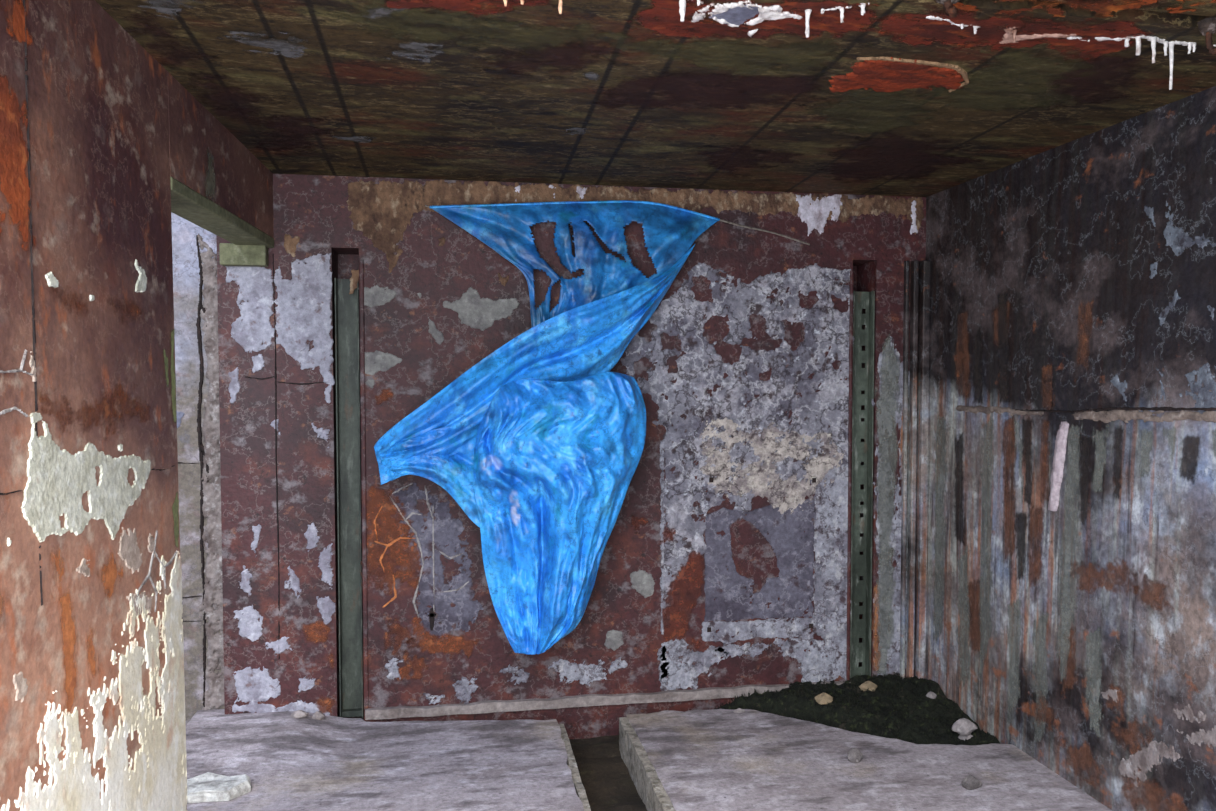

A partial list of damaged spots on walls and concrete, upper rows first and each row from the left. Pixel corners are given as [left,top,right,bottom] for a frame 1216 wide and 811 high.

rust [385,0,550,15]
rust [627,0,1216,62]
damp [926,16,981,34]
peeling [347,179,924,308]
peeling [1,412,188,811]
peeling [197,233,336,716]
rust [662,550,705,649]
peeling [620,262,855,691]
damp [931,417,993,685]
rust [1003,366,1052,586]
damp [1007,419,1123,741]
damp [1139,428,1216,482]